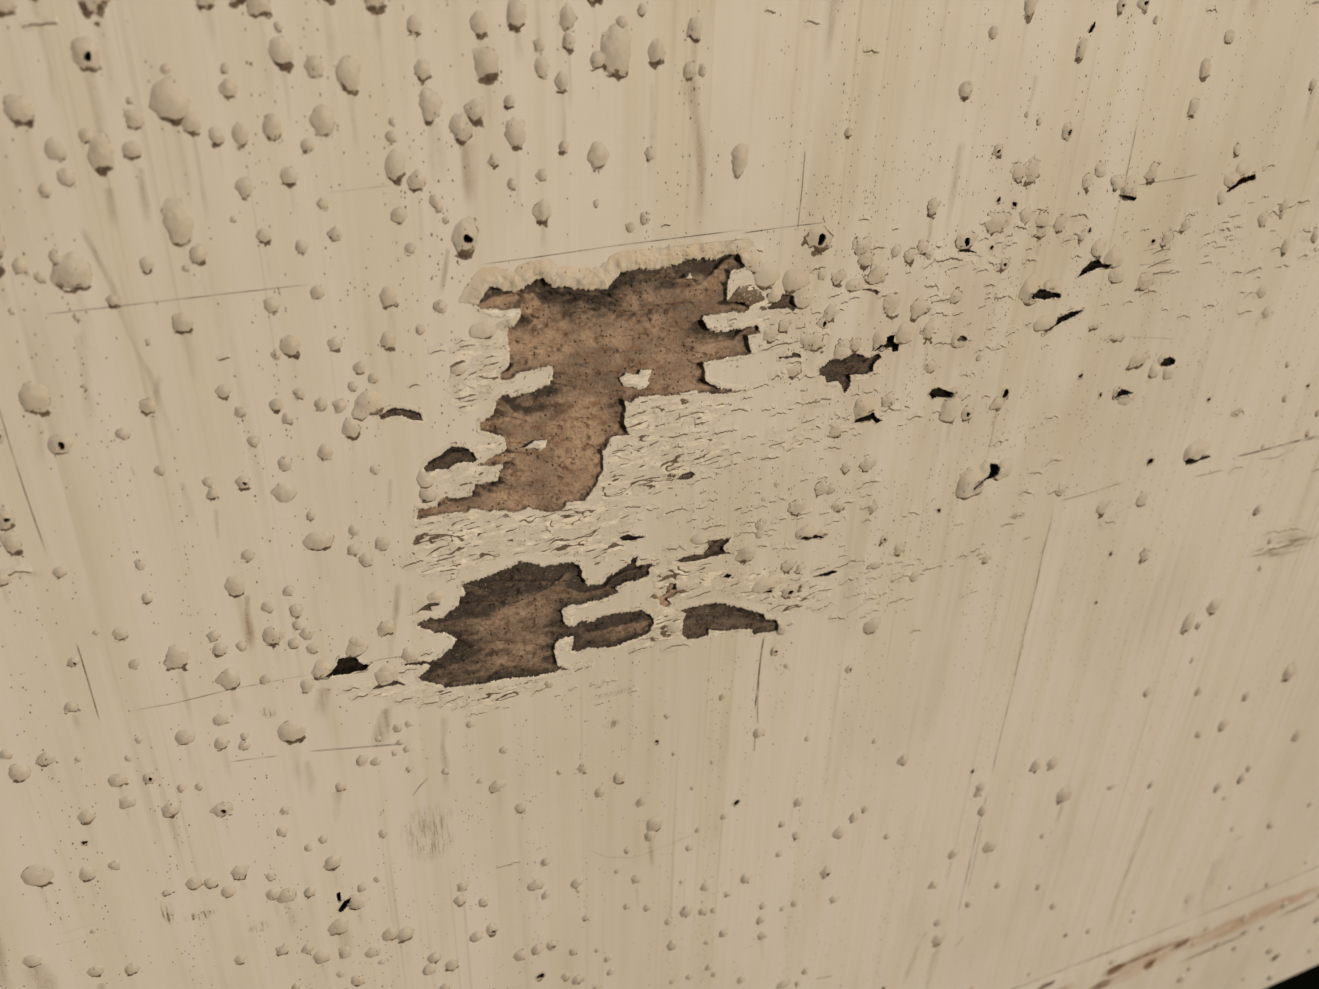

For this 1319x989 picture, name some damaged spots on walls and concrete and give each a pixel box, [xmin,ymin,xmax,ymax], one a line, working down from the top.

peeling [412,238,780,522]
peeling [828,374,870,388]
spalling [323,657,369,678]
peeling [401,534,788,690]